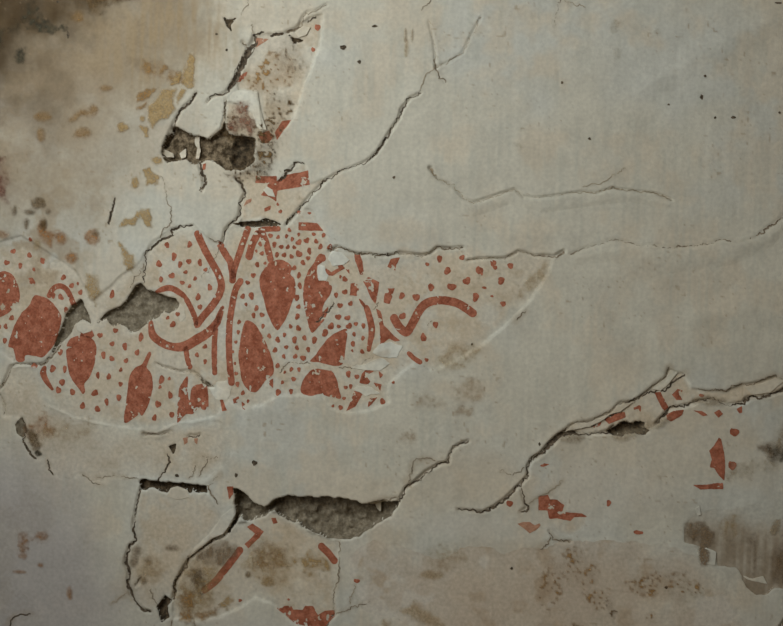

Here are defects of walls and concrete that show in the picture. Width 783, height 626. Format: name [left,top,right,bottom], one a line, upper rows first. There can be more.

damp [121,209,151,227]
damp [132,157,162,188]
damp [137,54,195,137]
crack [280,162,304,181]
crack [286,0,481,225]
flaking render [0,14,554,626]
crack [1,345,61,475]
crack [458,367,783,513]
flaking render [552,368,783,446]
crack [82,454,236,612]
flaking render [349,494,783,626]
damp [686,523,714,565]